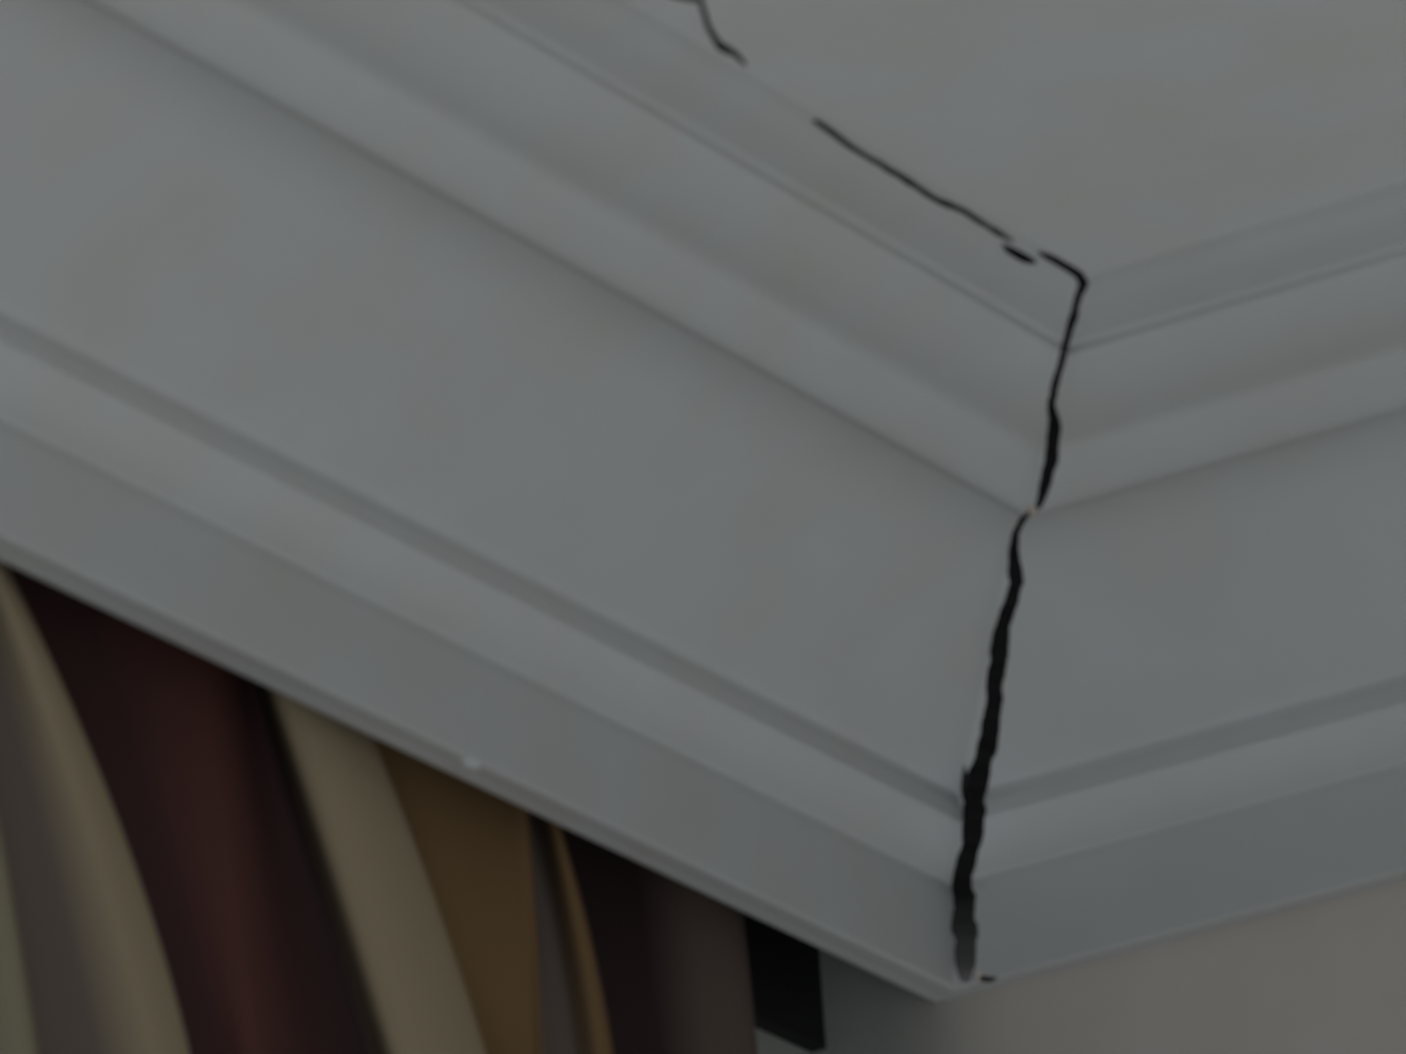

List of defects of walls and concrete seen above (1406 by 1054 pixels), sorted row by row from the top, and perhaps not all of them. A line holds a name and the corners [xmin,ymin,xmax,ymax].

crack [684,0,747,66]
crack [812,119,1089,982]